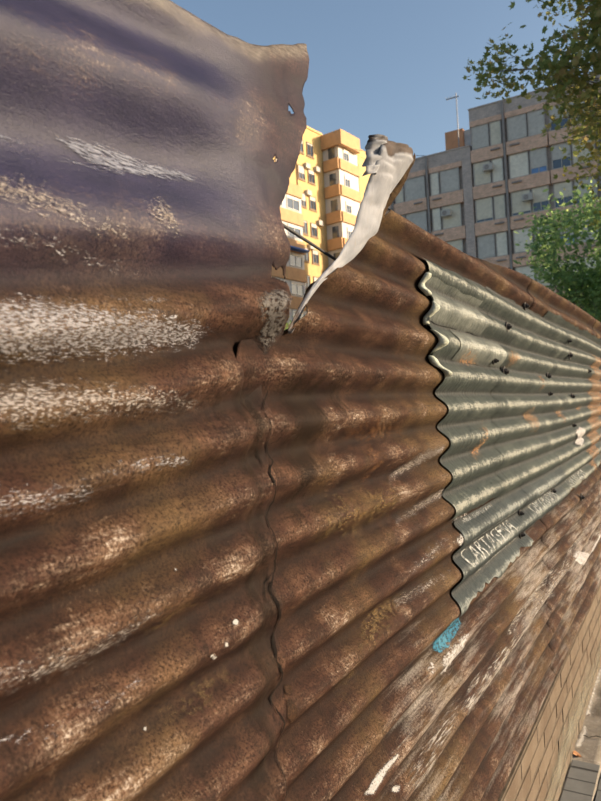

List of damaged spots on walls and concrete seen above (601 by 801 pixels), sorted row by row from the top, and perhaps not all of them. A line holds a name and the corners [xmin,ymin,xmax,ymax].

crack [252,381,287,800]